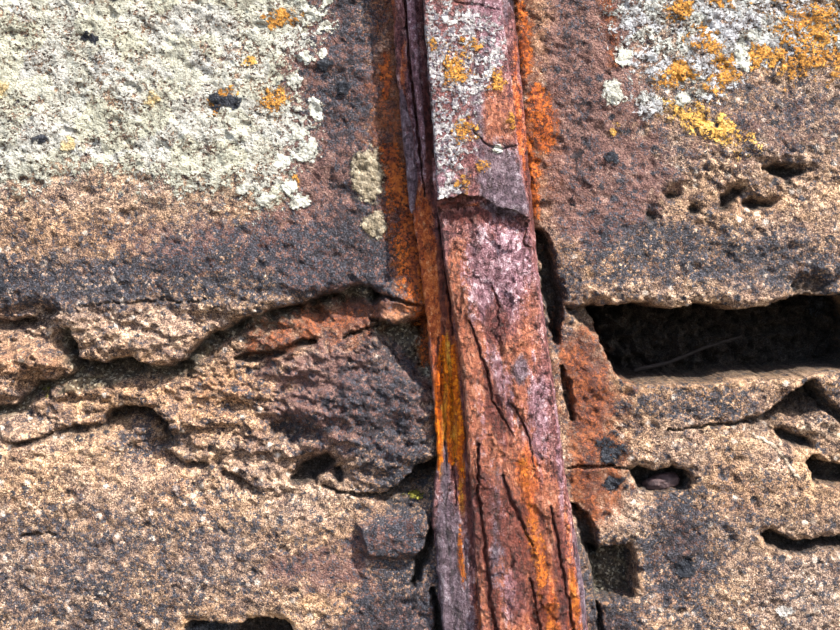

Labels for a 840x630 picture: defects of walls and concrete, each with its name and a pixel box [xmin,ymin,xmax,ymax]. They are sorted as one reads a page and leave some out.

corrosion [513,0,560,239]
corrosion [367,0,465,479]
crack [523,228,577,423]
crack [0,217,536,630]
corrosion [457,528,467,589]
corrosion [519,458,549,597]
corrosion [569,567,583,630]
crack [550,502,603,630]
corrosion [548,321,630,526]
crack [567,463,630,472]
crack [595,600,605,630]
crack [667,379,840,432]